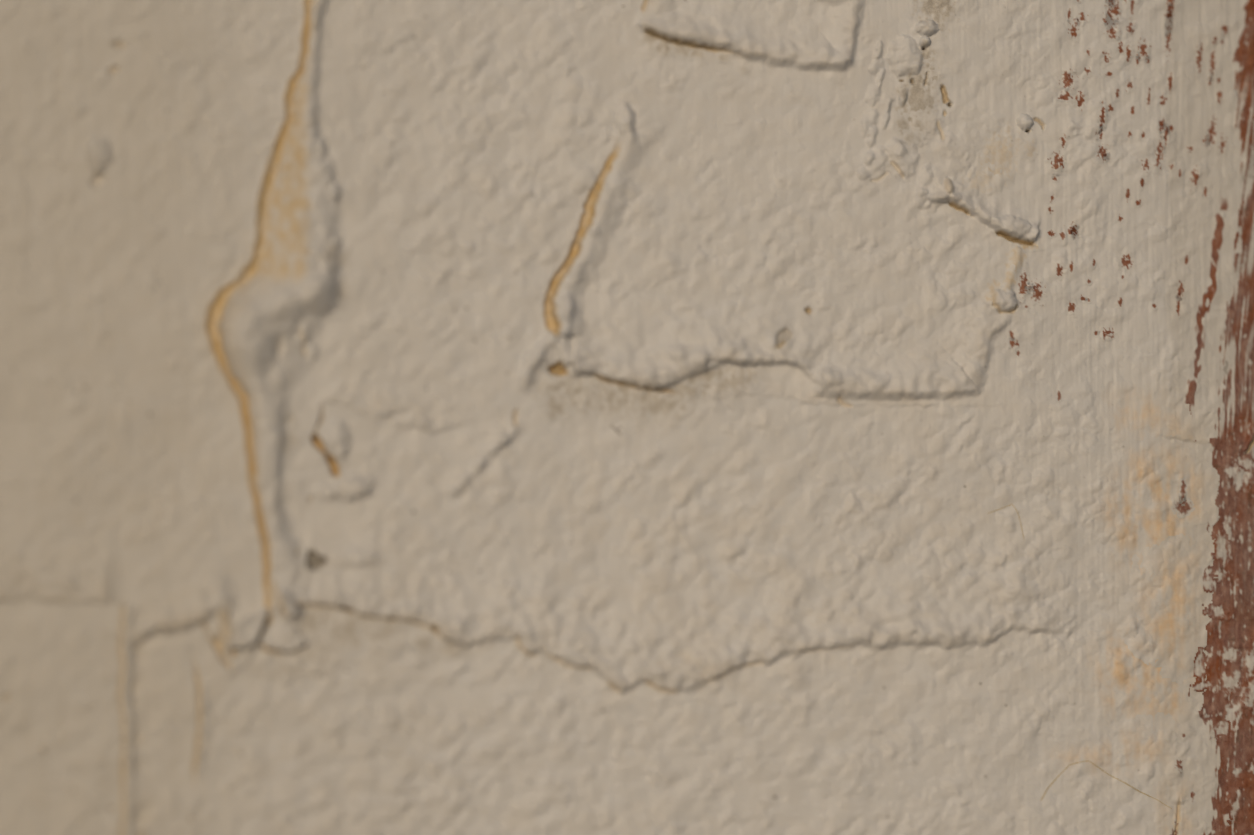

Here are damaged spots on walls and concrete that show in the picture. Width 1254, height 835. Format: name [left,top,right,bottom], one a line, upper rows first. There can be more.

spalling [772,325,798,350]
peeling [1003,328,1024,358]
peeling [1093,325,1117,341]
spalling [295,547,332,575]
peeling [1197,451,1254,621]
peeling [197,605,307,680]
crack [516,635,864,696]
peeling [1189,636,1254,742]
peeling [1172,758,1185,775]
peeling [1219,760,1254,835]